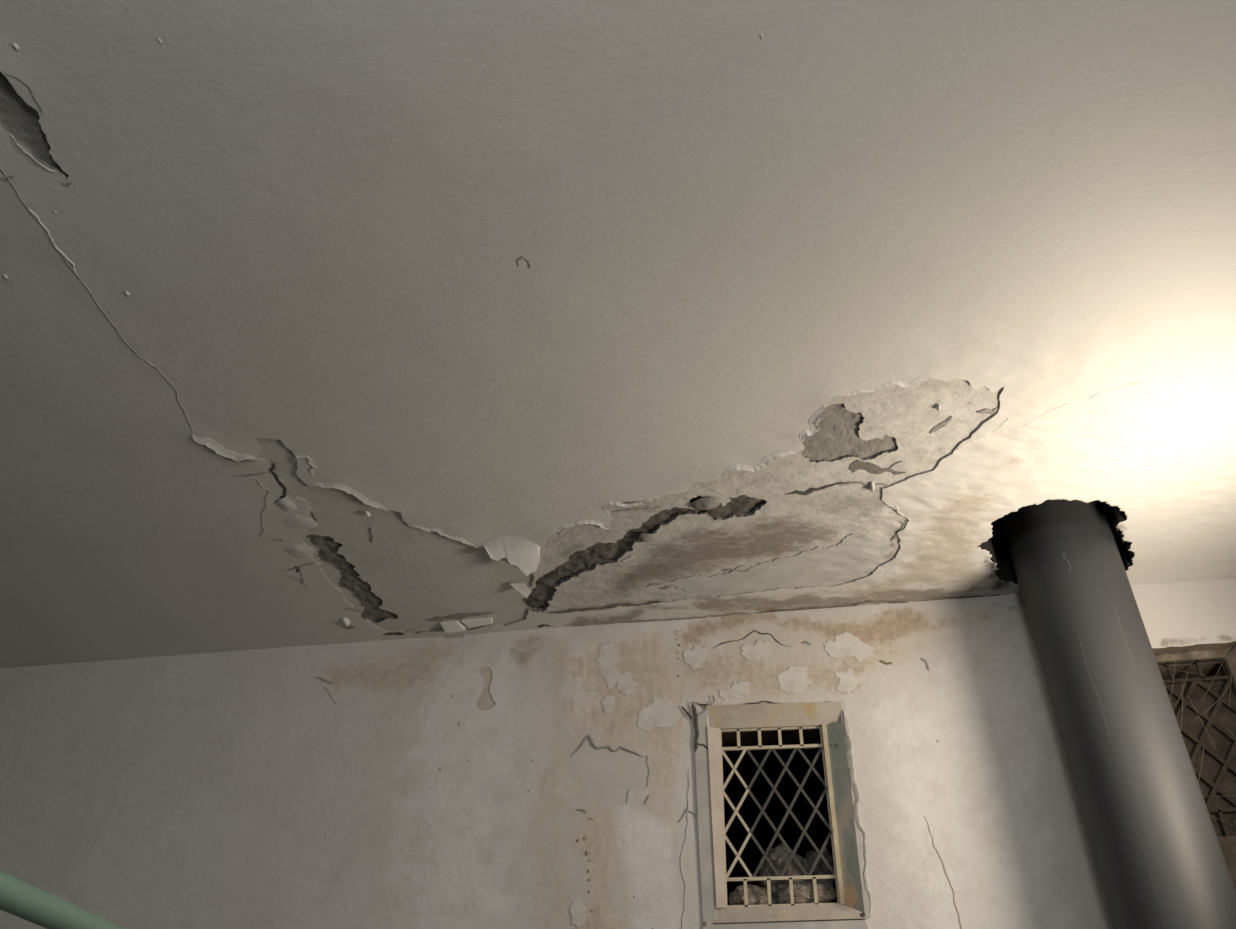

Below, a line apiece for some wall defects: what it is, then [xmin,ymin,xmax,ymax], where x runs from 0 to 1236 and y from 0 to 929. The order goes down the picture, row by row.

flaking render [0,71,71,186]
crack [0,167,193,430]
crack [282,566,307,586]
peeling [192,378,1006,632]
damp [570,605,671,626]
damp [617,517,835,592]
crack [713,630,811,658]
damp [683,590,974,689]
crack [678,695,778,929]